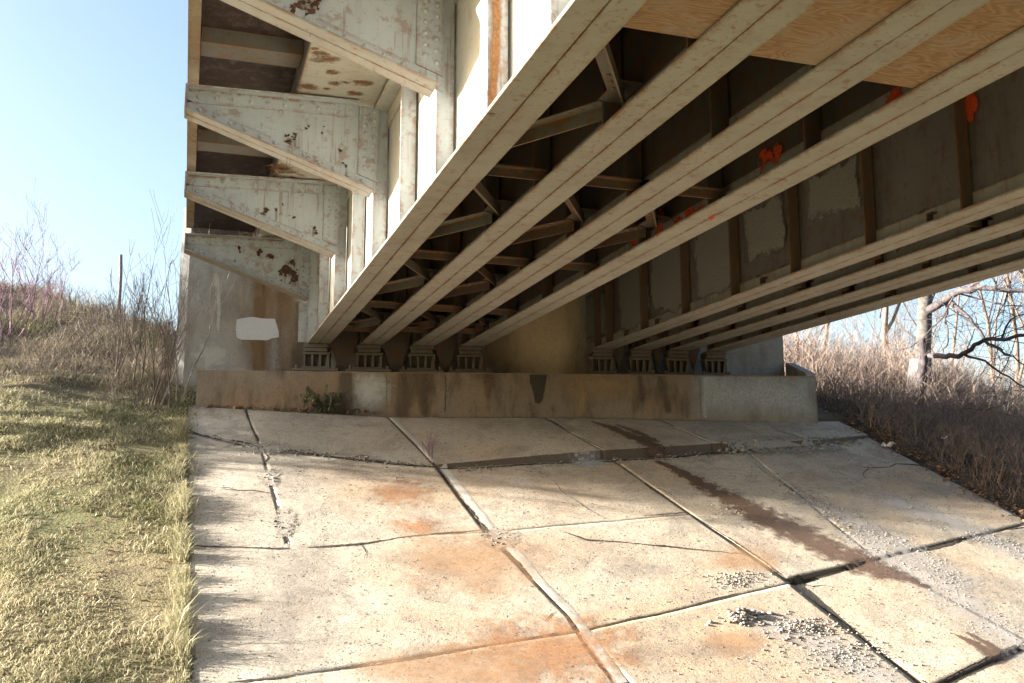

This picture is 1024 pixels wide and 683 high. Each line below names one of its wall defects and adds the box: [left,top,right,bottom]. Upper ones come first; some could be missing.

corrosion [298,48,373,96]
corrosion [488,0,502,116]
spalling [237,442,294,488]
spalling [271,507,298,537]
crack [189,382,858,683]
leakage [512,299,929,587]